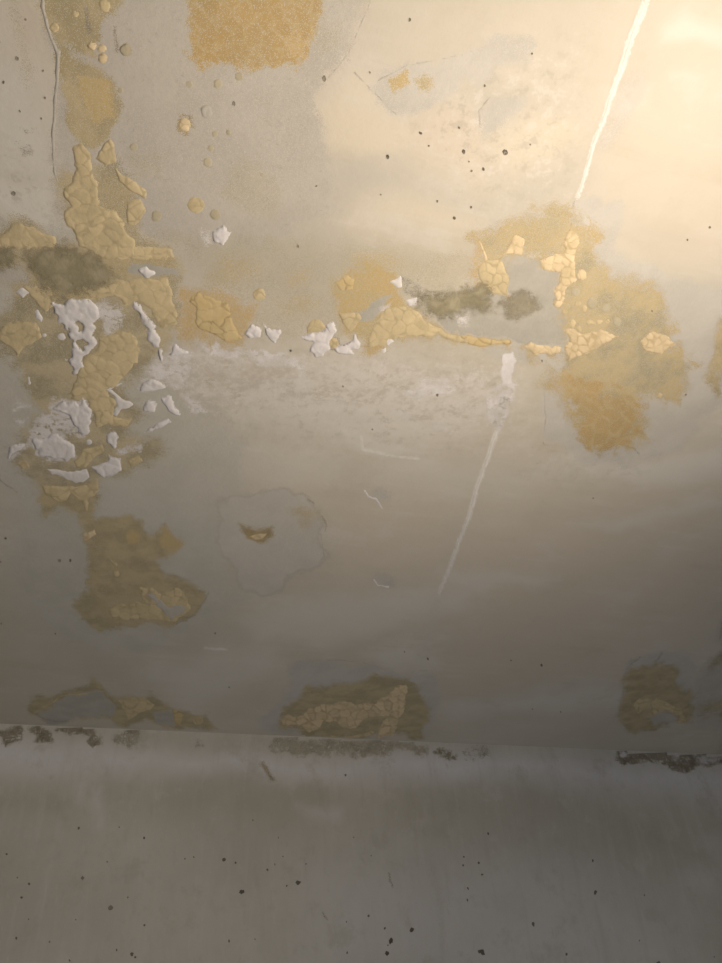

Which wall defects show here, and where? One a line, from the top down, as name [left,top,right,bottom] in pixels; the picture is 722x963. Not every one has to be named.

crack [575,0,651,200]
leakage [0,0,722,638]
peeling [432,252,569,348]
crack [412,351,520,677]
spalling [0,725,142,750]
spalling [263,737,491,762]
spalling [615,751,722,774]